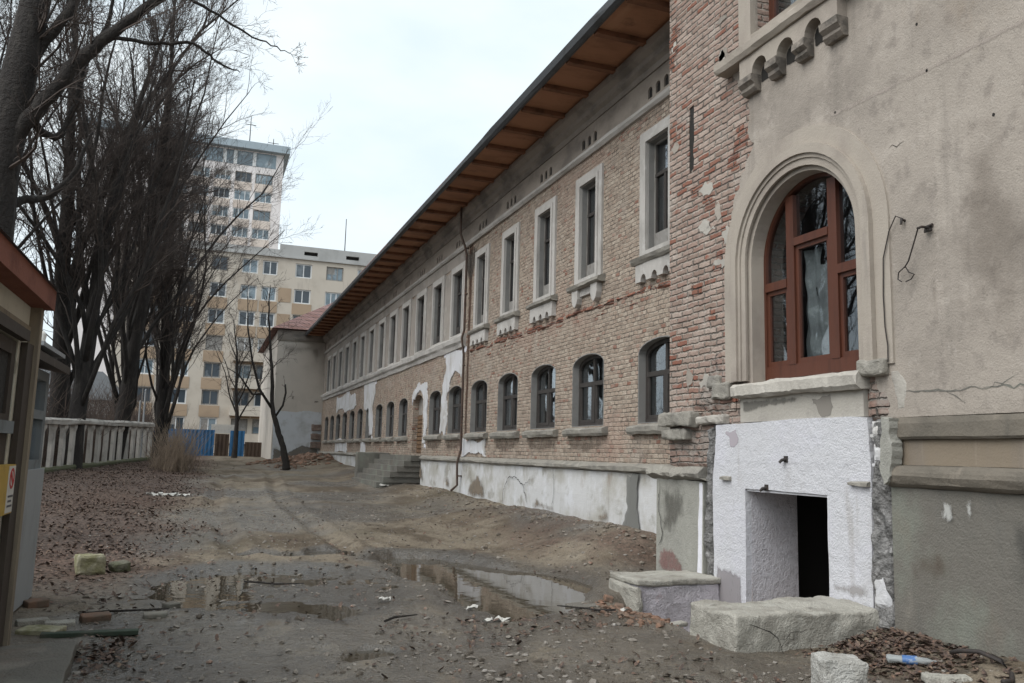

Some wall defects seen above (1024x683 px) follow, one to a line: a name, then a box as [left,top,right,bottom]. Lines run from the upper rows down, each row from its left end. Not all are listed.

crack [907,374,1024,402]
damp [665,494,680,525]
flaking render [869,371,907,630]